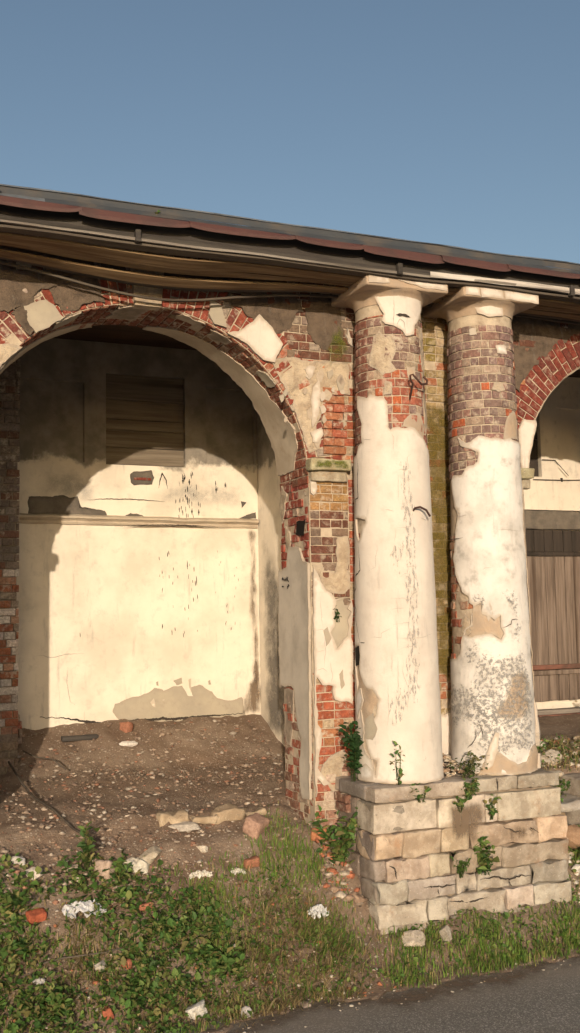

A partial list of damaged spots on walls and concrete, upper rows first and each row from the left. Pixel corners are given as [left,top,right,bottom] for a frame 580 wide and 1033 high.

peeling [0,245,125,335]
peeling [0,343,22,367]
spalling [164,272,447,456]
spalling [447,286,580,481]
spalling [28,495,107,515]
peeling [112,678,245,722]
peeling [278,479,379,828]
spalling [450,536,504,659]
spalling [498,487,536,725]
crack [426,874,531,903]